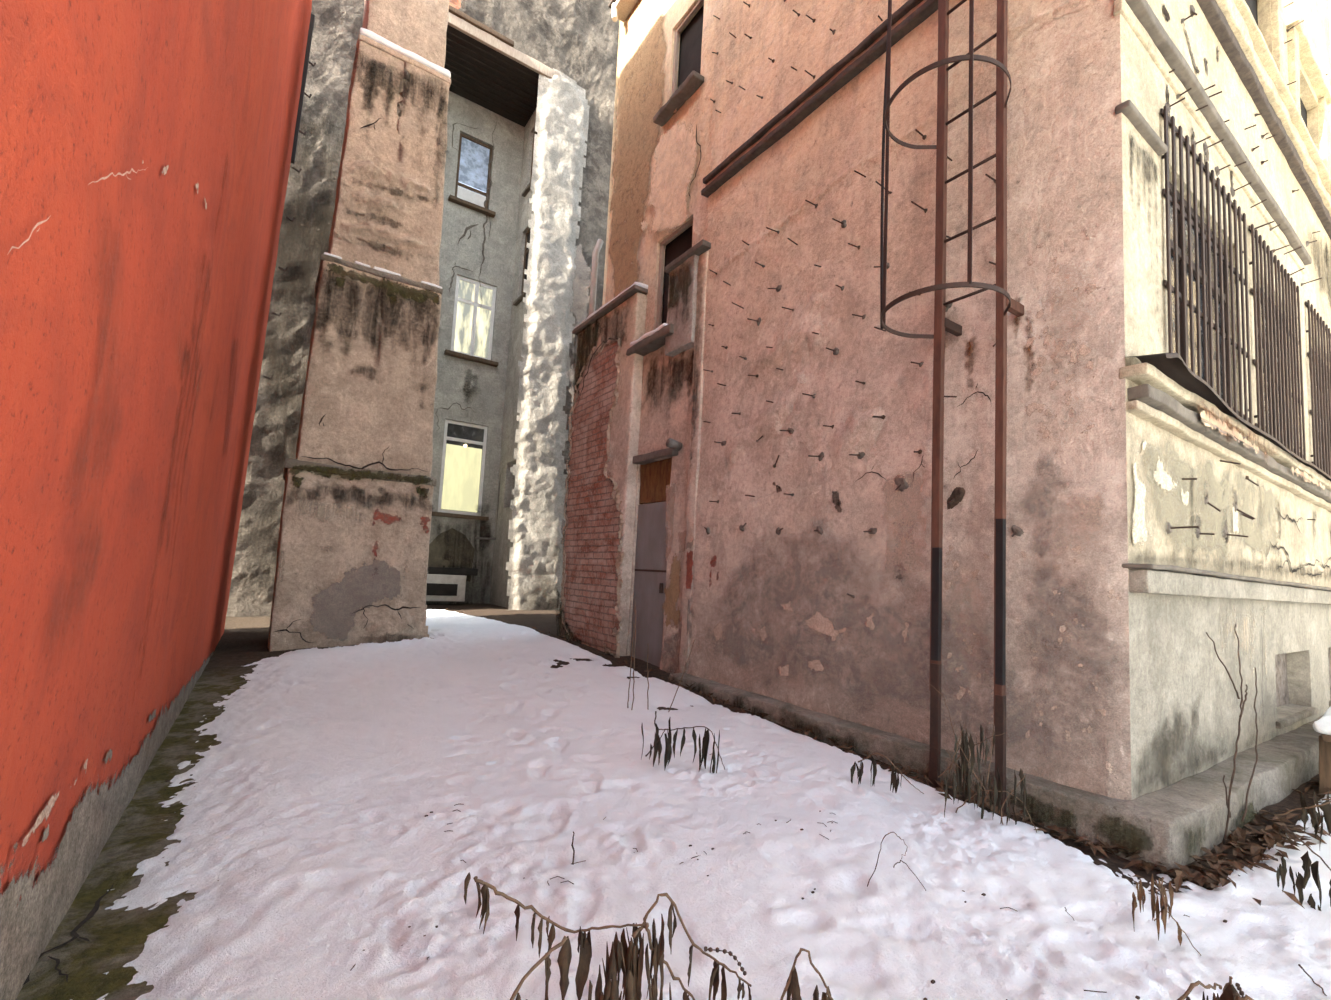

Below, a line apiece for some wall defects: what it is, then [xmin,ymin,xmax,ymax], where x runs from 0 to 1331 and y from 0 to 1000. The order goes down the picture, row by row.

damp [364,88,392,112]
crack [449,121,497,308]
crack [301,447,428,472]
flaking render [524,243,625,658]
peeling [1132,441,1279,557]
flaking render [1200,411,1259,454]
flaking render [1291,466,1325,490]
crack [1266,508,1331,577]
crack [275,619,313,643]
crack [352,604,420,629]
peeling [0,647,217,1000]